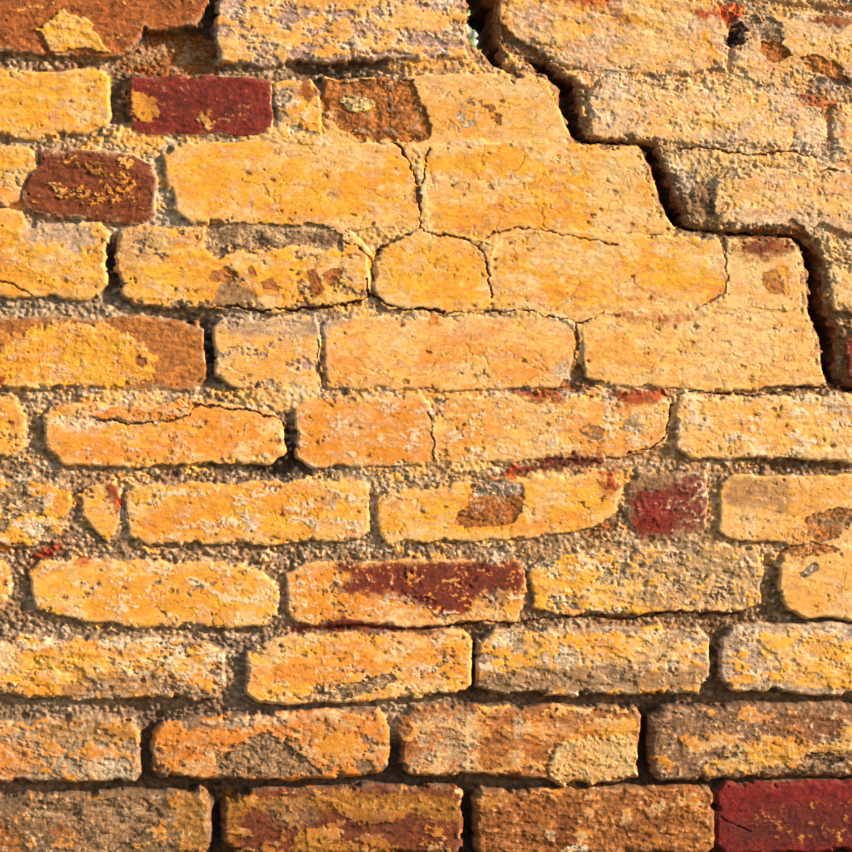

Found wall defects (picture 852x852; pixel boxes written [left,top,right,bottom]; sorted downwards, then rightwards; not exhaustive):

crack [465,0,852,455]
spalling [454,478,525,528]